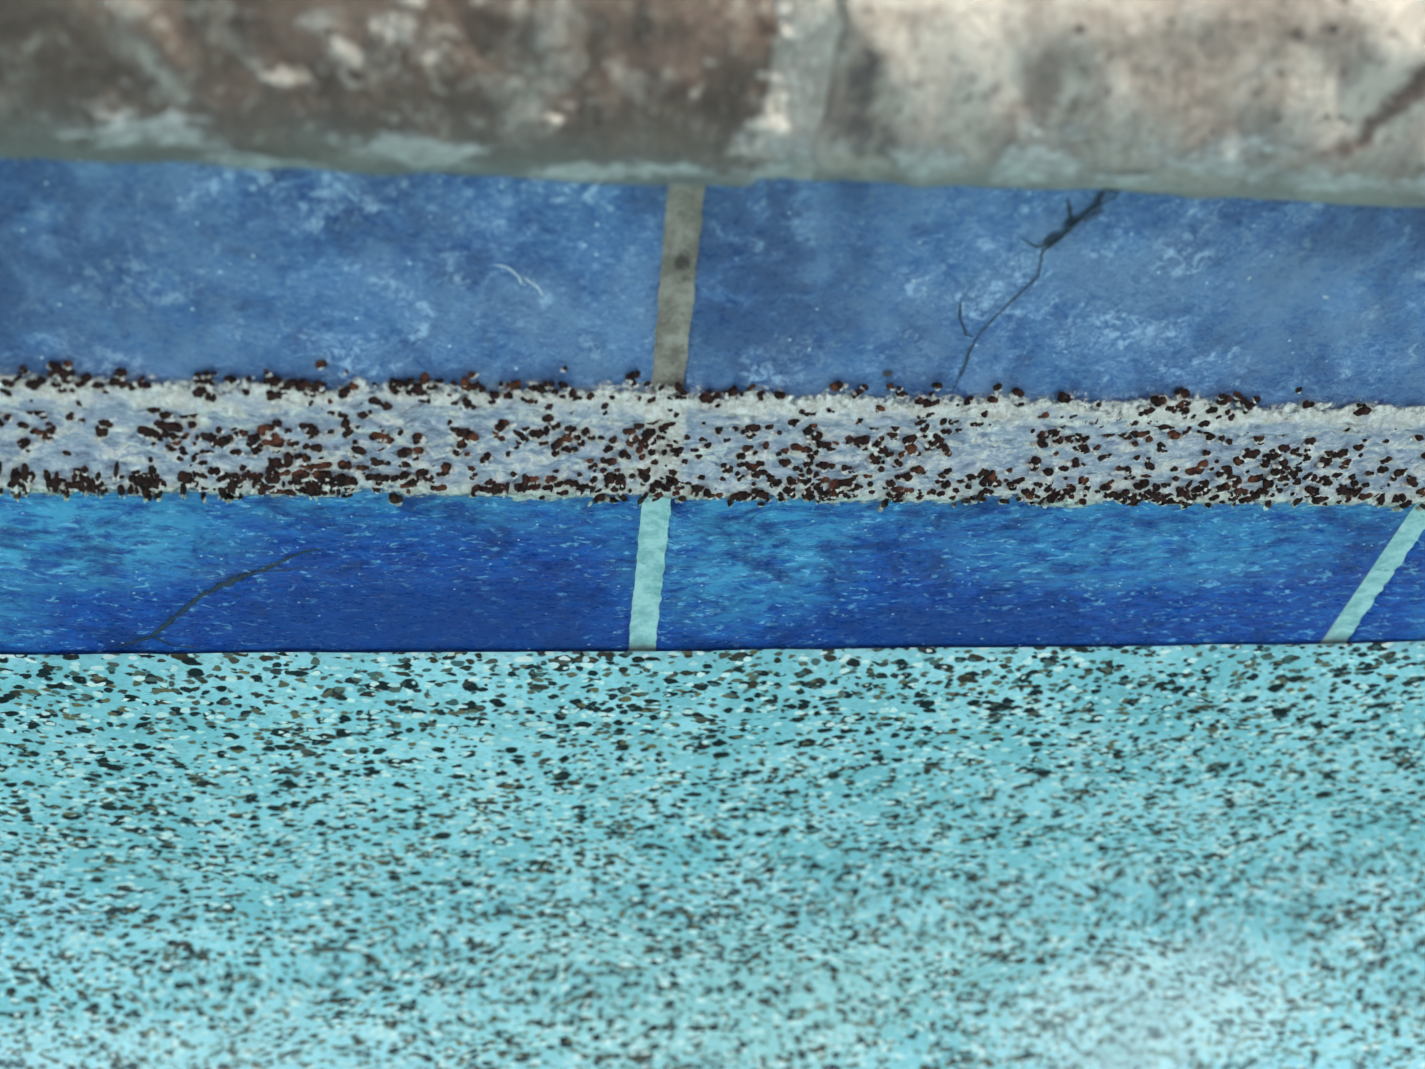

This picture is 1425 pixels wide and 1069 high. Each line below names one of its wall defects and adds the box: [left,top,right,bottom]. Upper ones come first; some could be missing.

crack [954,188,1120,387]